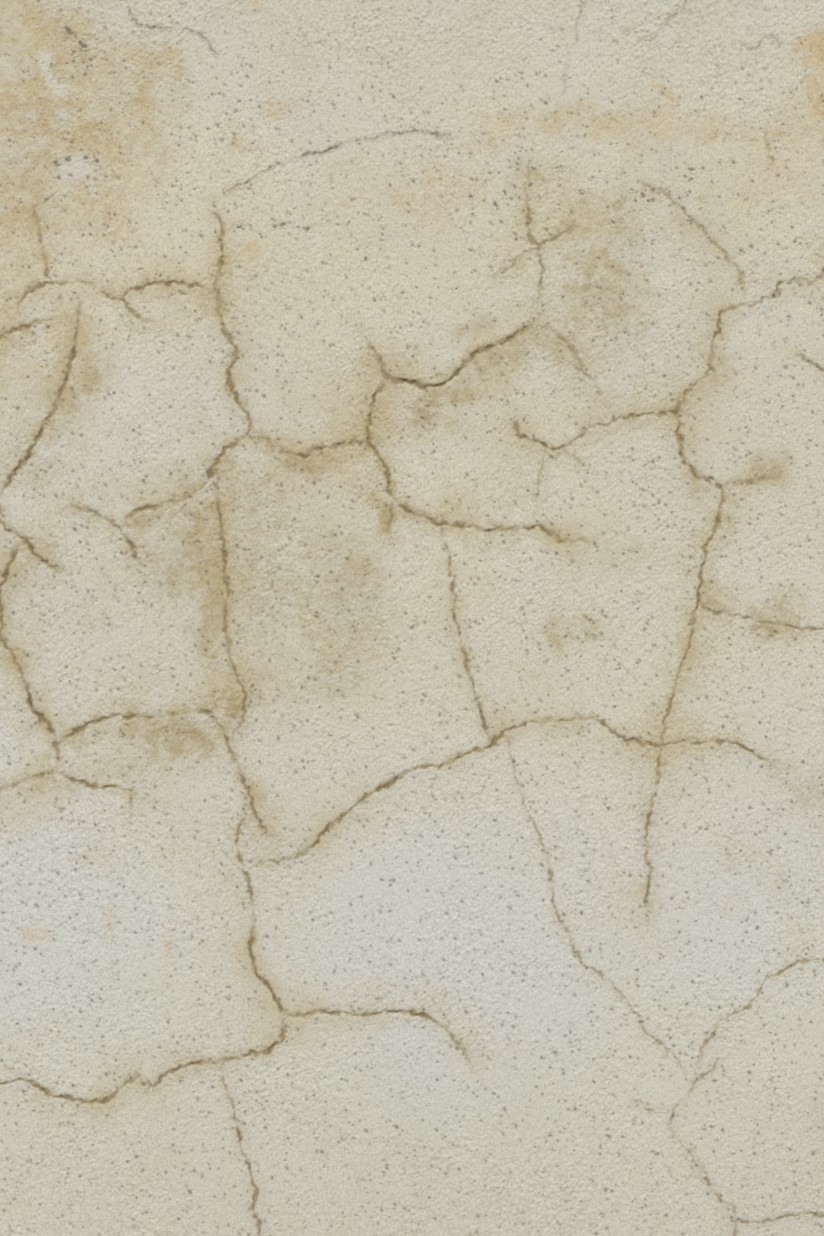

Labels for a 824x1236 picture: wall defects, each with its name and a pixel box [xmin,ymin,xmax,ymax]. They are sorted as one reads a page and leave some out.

crack [127,4,218,57]
crack [561,0,589,95]
crack [637,0,688,41]
crack [740,32,783,50]
crack [224,127,455,195]
crack [761,130,779,175]
crack [0,151,824,826]
crack [0,455,786,1236]
crack [628,956,824,1236]